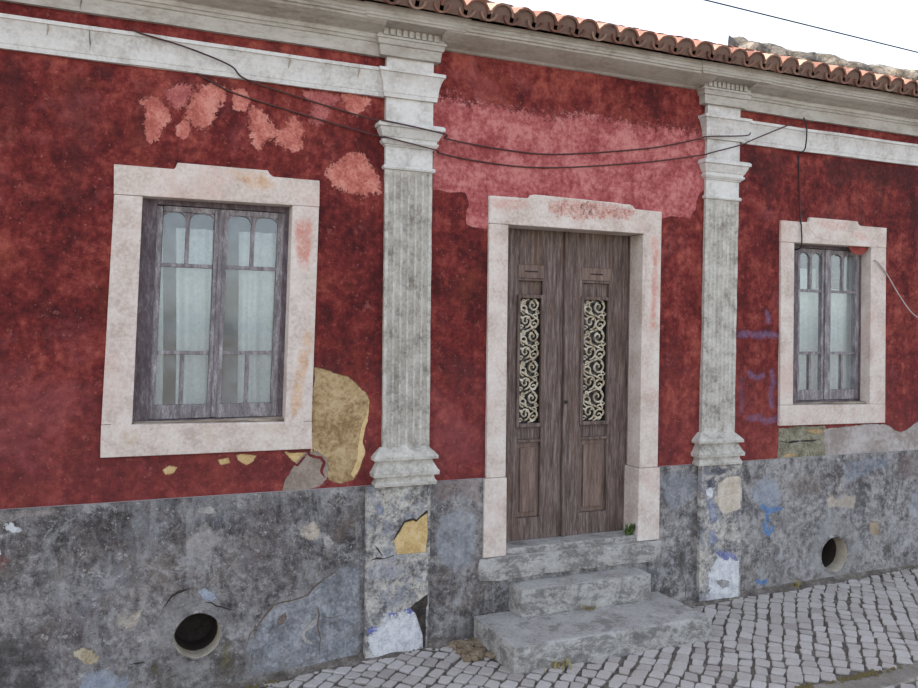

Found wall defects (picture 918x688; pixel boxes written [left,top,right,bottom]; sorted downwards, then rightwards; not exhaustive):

peeling [139,79,371,153]
peeling [324,151,383,200]
peeling [153,457,186,483]
peeling [208,451,265,473]
flaking render [277,360,377,491]
flaking render [777,425,826,459]
peeling [836,452,897,492]
peeling [659,465,742,601]
crack [160,587,235,615]
crack [246,565,343,652]
peeling [228,504,484,683]